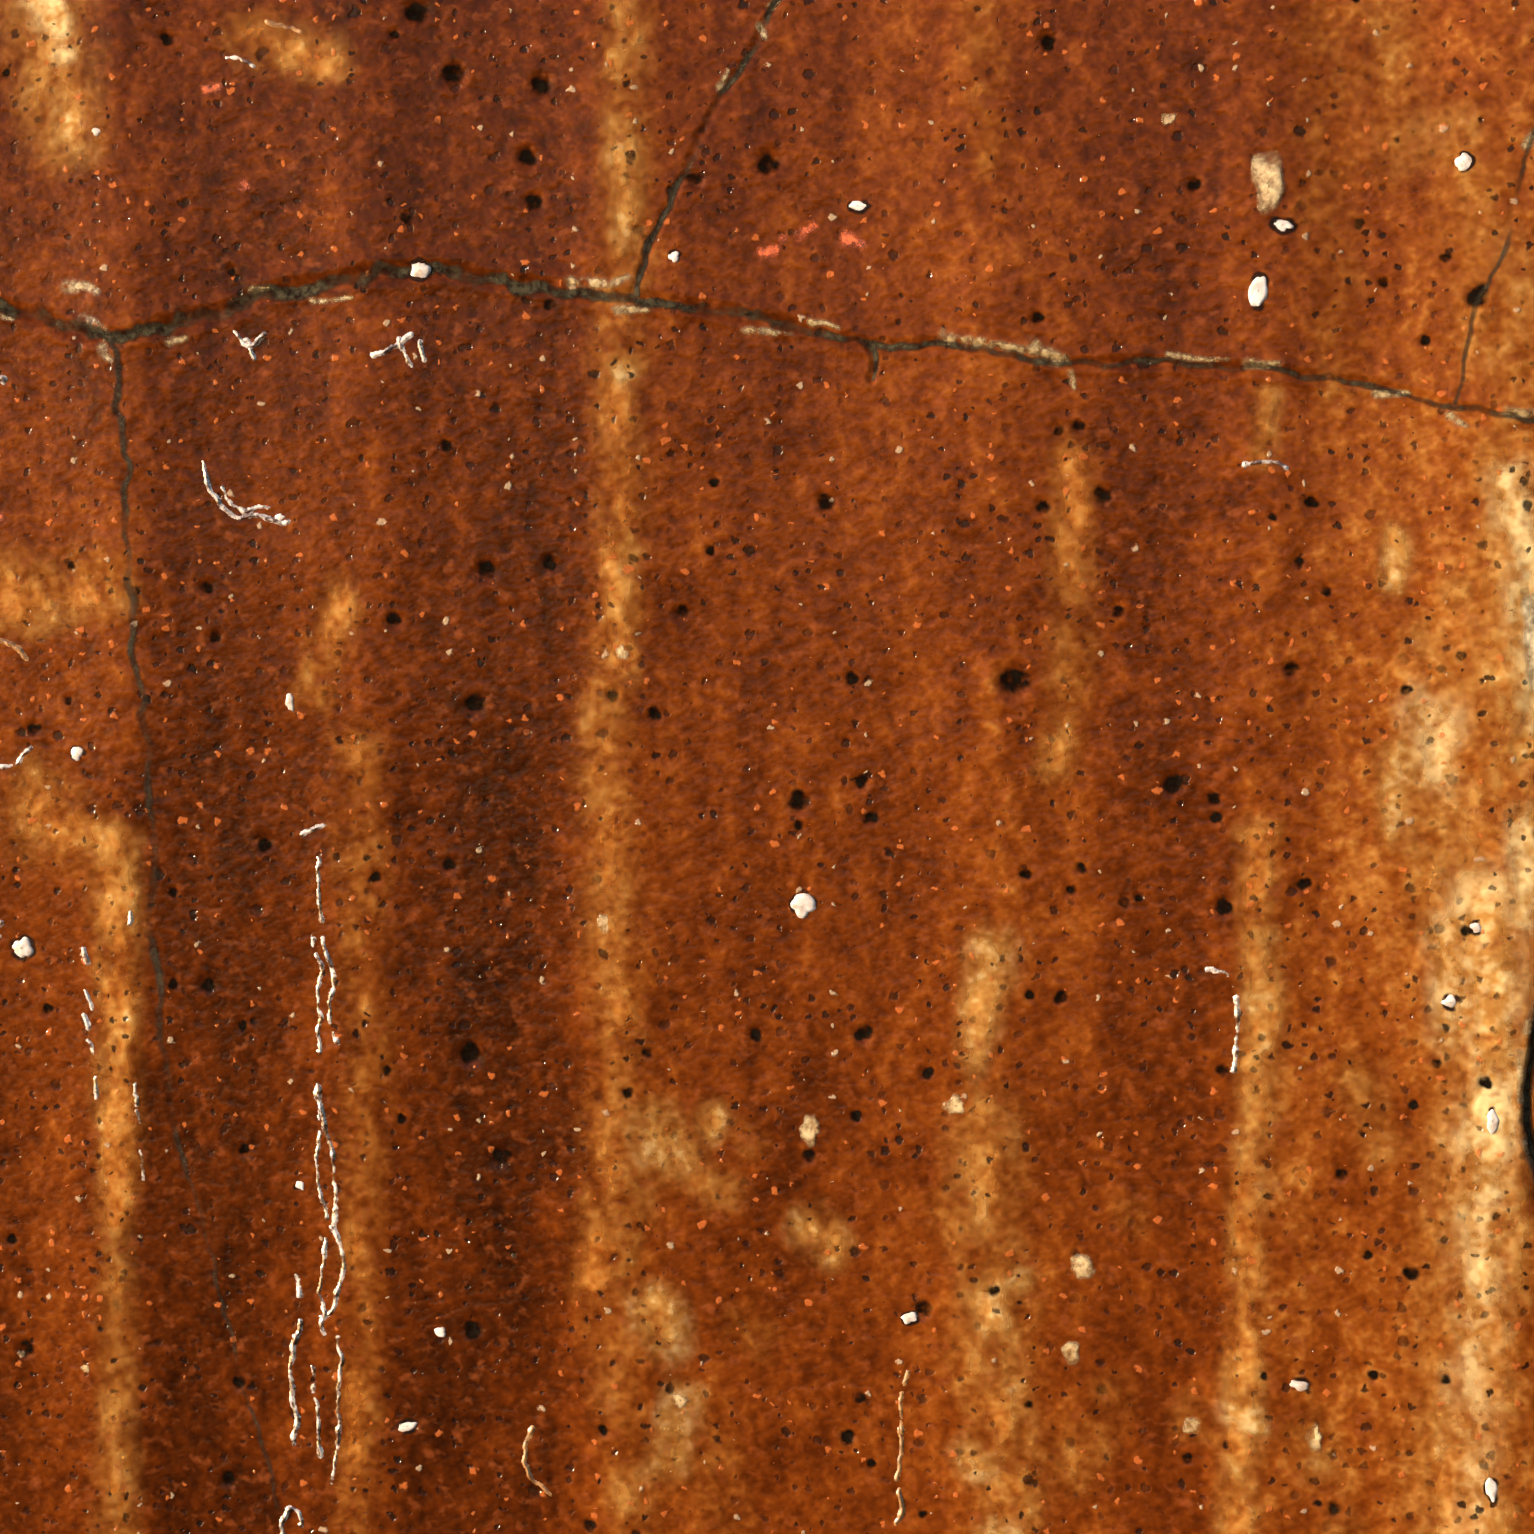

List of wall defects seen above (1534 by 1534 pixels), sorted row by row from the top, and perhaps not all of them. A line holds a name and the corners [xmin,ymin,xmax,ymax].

crack [717,0,781,94]
crack [1521,130,1534,171]
rust [758,223,817,256]
rust [841,231,865,248]
crack [226,175,1534,427]
crack [0,282,187,711]
leakage [1384,524,1408,588]
leakage [579,0,648,1301]
leakage [1382,746,1407,841]
crack [150,937,164,1031]
leakage [1412,421,1534,1534]
leakage [641,1107,729,1199]